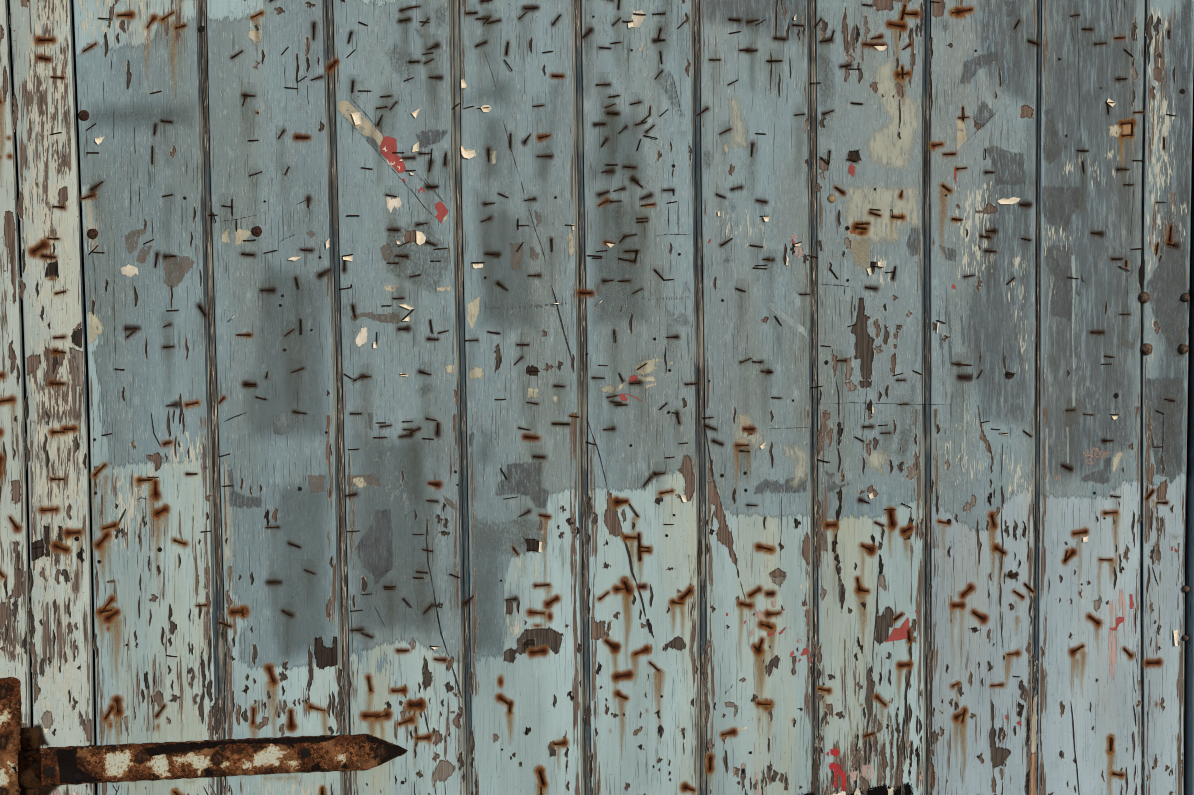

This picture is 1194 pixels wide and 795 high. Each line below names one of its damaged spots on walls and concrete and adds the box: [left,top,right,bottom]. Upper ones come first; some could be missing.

corrosion [34,36,56,63]
corrosion [28,237,59,260]
corrosion [611,496,653,569]
corrosion [860,506,914,556]
corrosion [1062,528,1089,565]
corrosion [526,583,561,627]
corrosion [597,576,648,629]
corrosion [669,586,694,621]
corrosion [950,583,989,625]
corrosion [737,586,782,720]
corrosion [603,638,664,734]
corrosion [286,674,433,763]